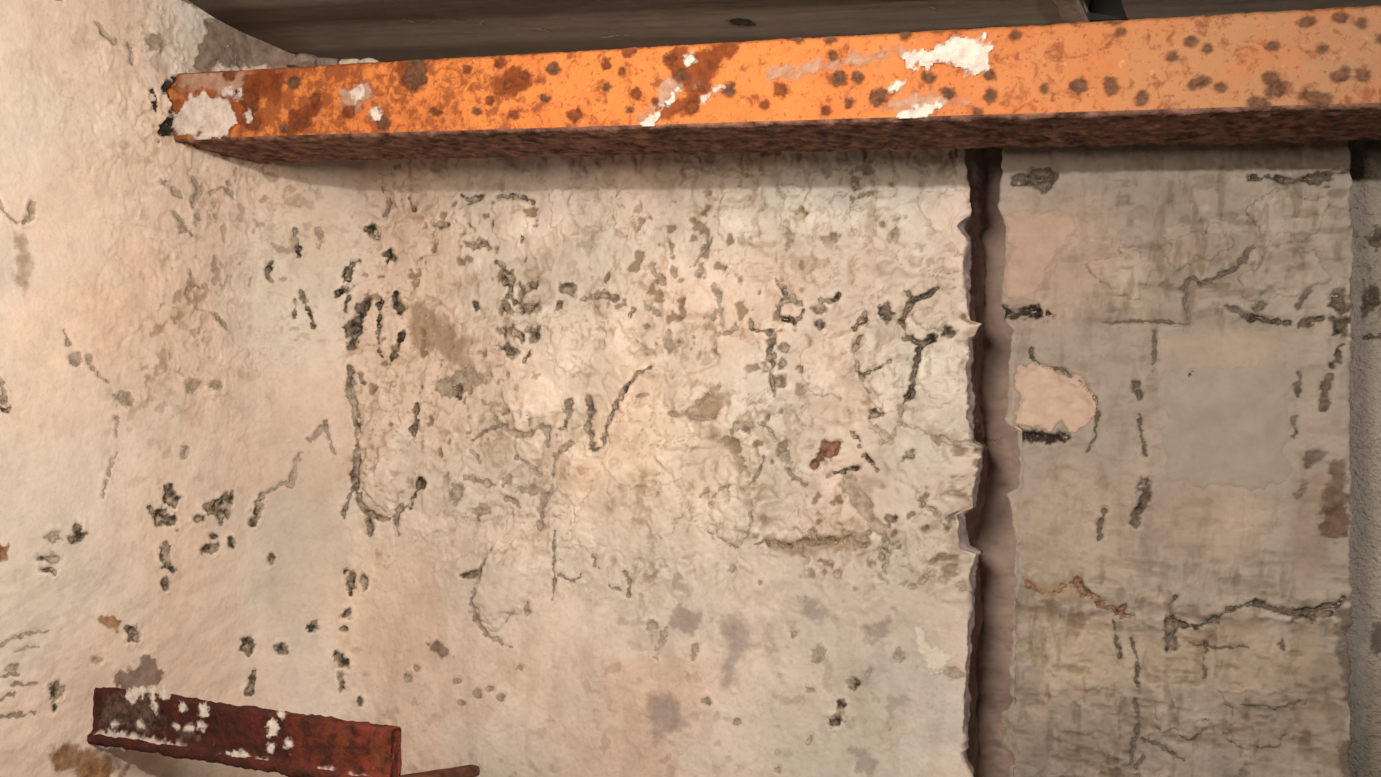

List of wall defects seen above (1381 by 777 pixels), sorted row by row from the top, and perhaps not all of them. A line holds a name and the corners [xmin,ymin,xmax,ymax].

rust [222,69,322,136]
rust [472,56,562,119]
rust [627,42,738,119]
rust [822,36,887,115]
peeling [491,186,660,244]
crack [259,186,535,537]
peeling [494,260,643,425]
flaking render [1014,363,1101,433]
crack [1096,244,1324,541]
crack [460,236,1002,648]
crack [1023,576,1351,769]
rust [52,744,129,777]